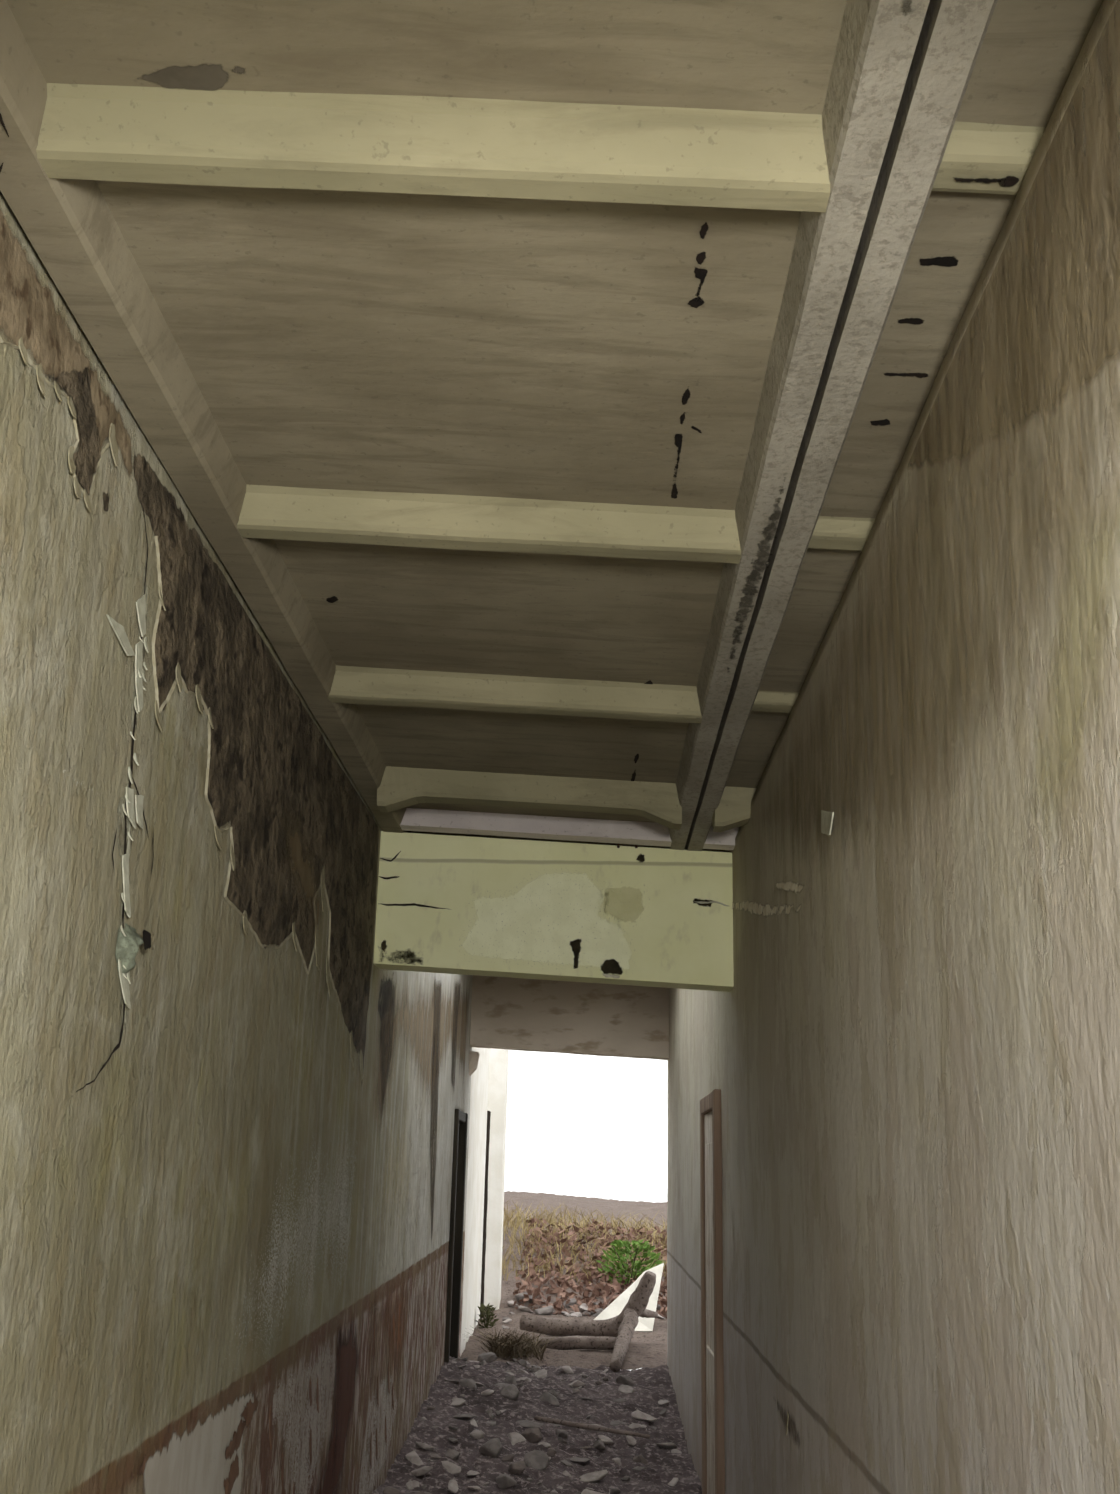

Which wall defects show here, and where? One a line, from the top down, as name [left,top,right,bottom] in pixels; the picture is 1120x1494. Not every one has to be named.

crack [76,499,154,1092]
flaking render [0,209,379,1083]
damp [781,0,1120,834]
peeling [131,1343,337,1494]